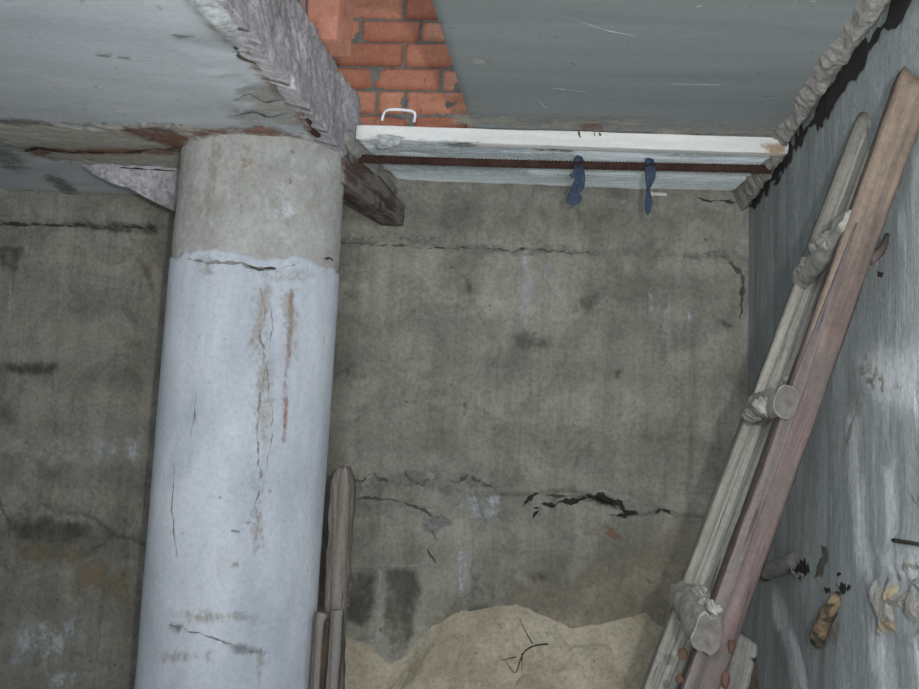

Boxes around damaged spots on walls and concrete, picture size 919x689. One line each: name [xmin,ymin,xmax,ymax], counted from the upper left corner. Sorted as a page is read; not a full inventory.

spalling [212,0,362,163]
rust [125,122,209,149]
crack [0,221,157,233]
crack [188,258,308,521]
crack [170,462,178,555]
crack [522,480,675,519]
damp [347,570,419,639]
flaking render [881,551,919,625]